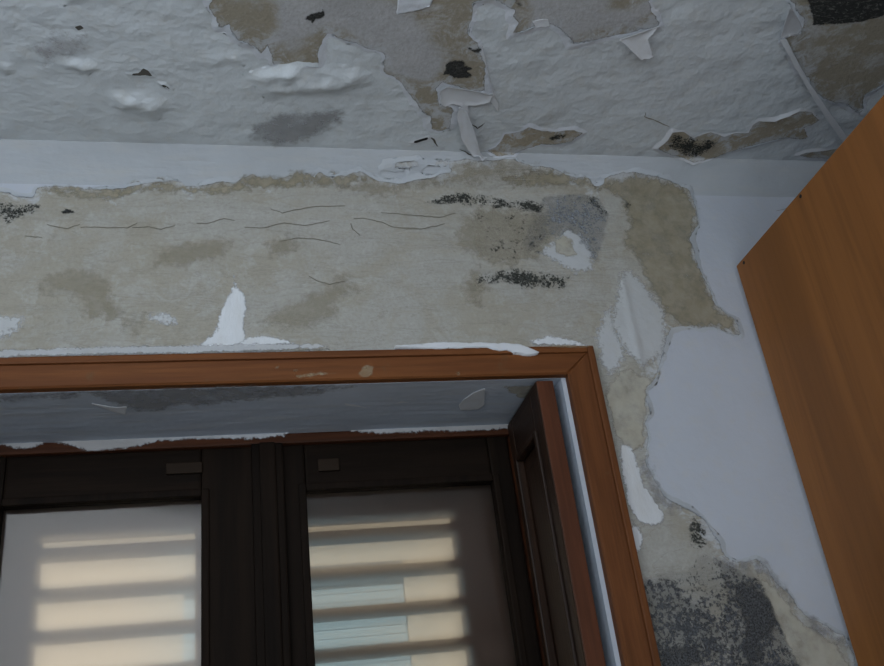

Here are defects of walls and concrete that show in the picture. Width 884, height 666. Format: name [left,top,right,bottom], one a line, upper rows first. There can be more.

peeling [202,0,664,161]
peeling [778,0,884,115]
mould [808,0,884,25]
mould [0,203,40,223]
crack [31,223,175,238]
crack [197,206,455,245]
water stain [433,171,734,332]
peeling [0,123,858,666]
water stain [644,516,849,666]